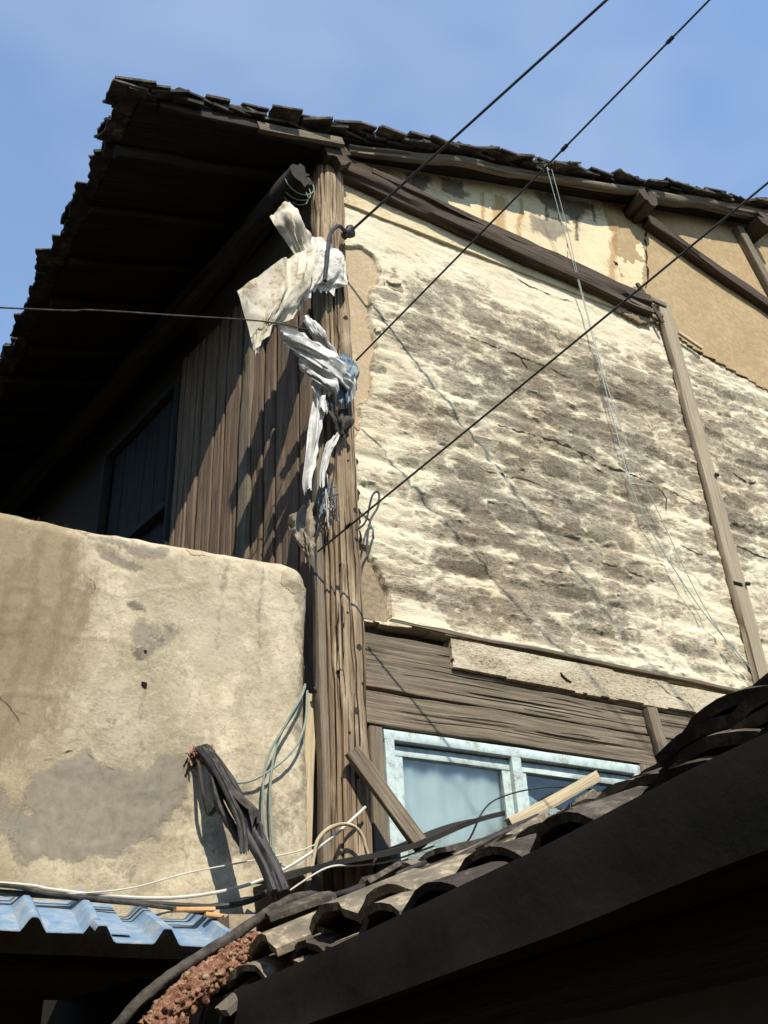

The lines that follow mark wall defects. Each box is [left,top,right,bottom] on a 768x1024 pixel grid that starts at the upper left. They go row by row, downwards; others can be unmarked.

leakage [531,192,596,241]
peeling [346,246,404,437]
crack [461,333,575,379]
crack [356,459,374,544]
crack [458,459,561,496]
crack [498,424,695,511]
spalling [359,541,392,622]
leakage [0,674,191,865]